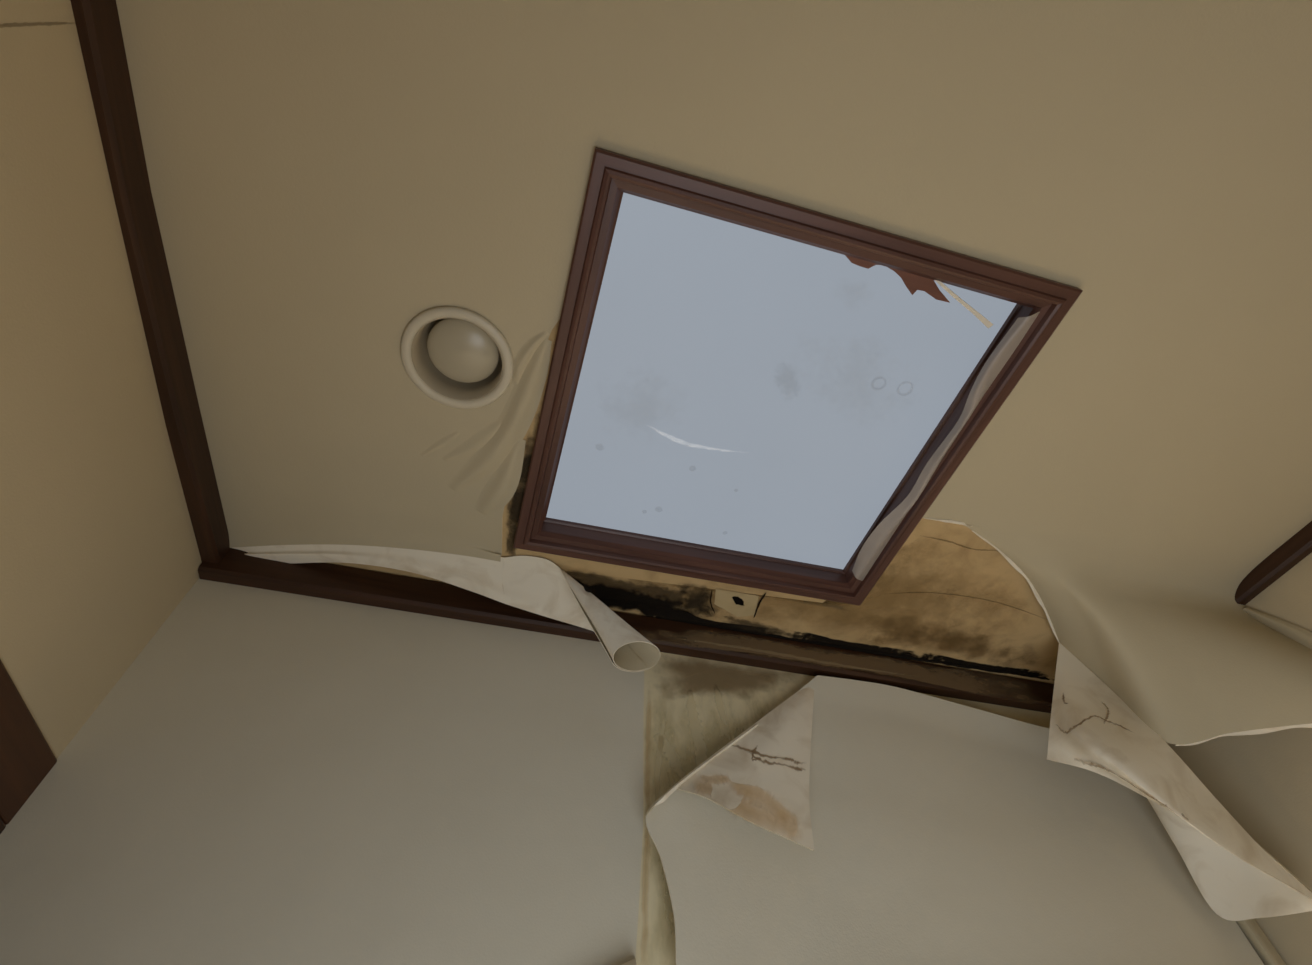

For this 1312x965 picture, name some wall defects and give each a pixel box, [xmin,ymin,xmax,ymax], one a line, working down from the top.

leakage [684,639,904,675]
leakage [676,663,772,691]
leakage [736,745,802,771]